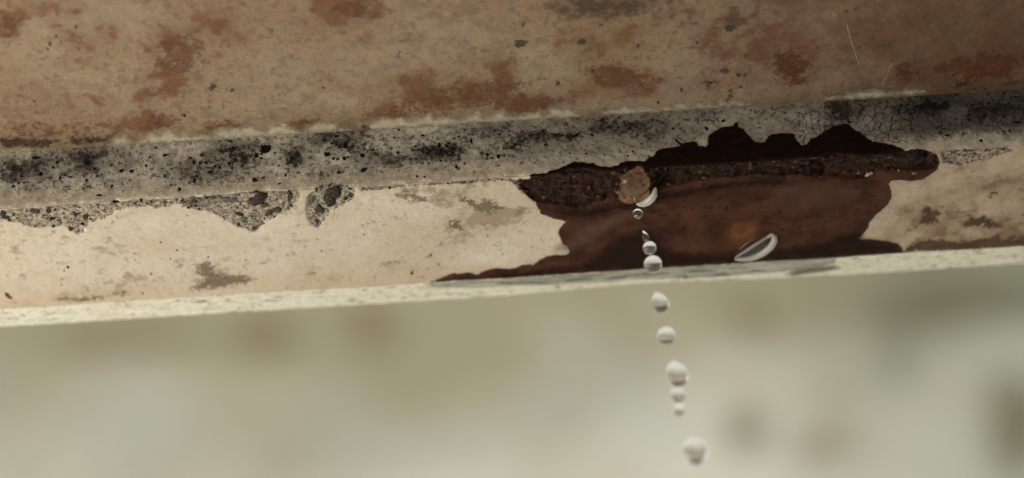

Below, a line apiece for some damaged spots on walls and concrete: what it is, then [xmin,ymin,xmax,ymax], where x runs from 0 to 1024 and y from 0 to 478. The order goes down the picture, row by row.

rust [772,47,811,86]
crack [799,85,1008,144]
water stain [0,147,101,181]
water stain [112,123,378,180]
spalling [0,135,1012,233]
water stain [369,90,1024,288]